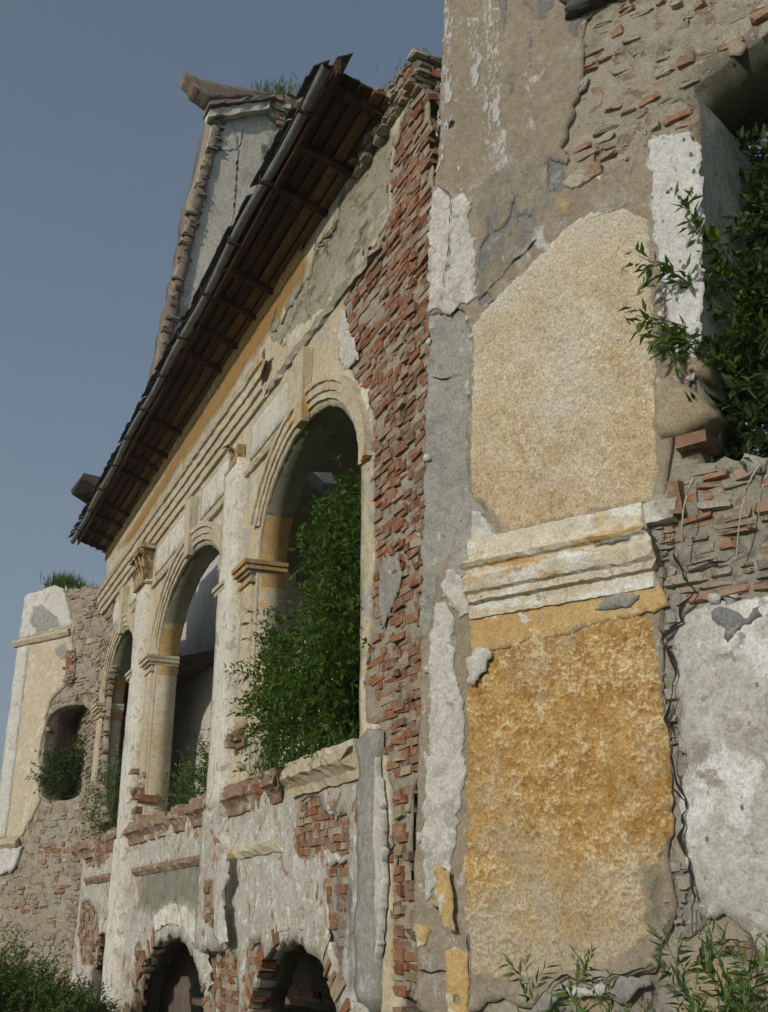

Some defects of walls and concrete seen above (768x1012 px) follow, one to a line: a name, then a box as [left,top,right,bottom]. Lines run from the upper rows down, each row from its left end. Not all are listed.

crack [230,129,244,226]
flaking render [548,0,768,359]
flaking render [0,584,117,1007]
flaking render [271,92,518,1012]
flaking render [523,453,768,1012]
crack [659,534,752,1009]